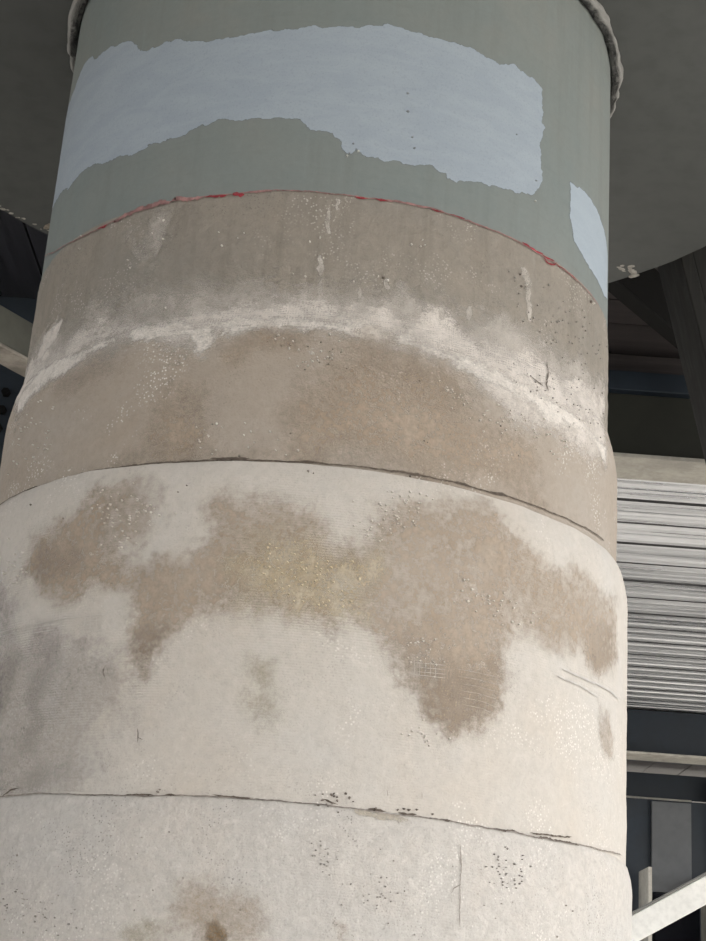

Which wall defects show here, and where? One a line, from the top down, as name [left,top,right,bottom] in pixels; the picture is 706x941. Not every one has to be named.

damp [34,319,63,366]
damp [521,267,532,321]
damp [297,357,533,476]
damp [26,490,616,732]